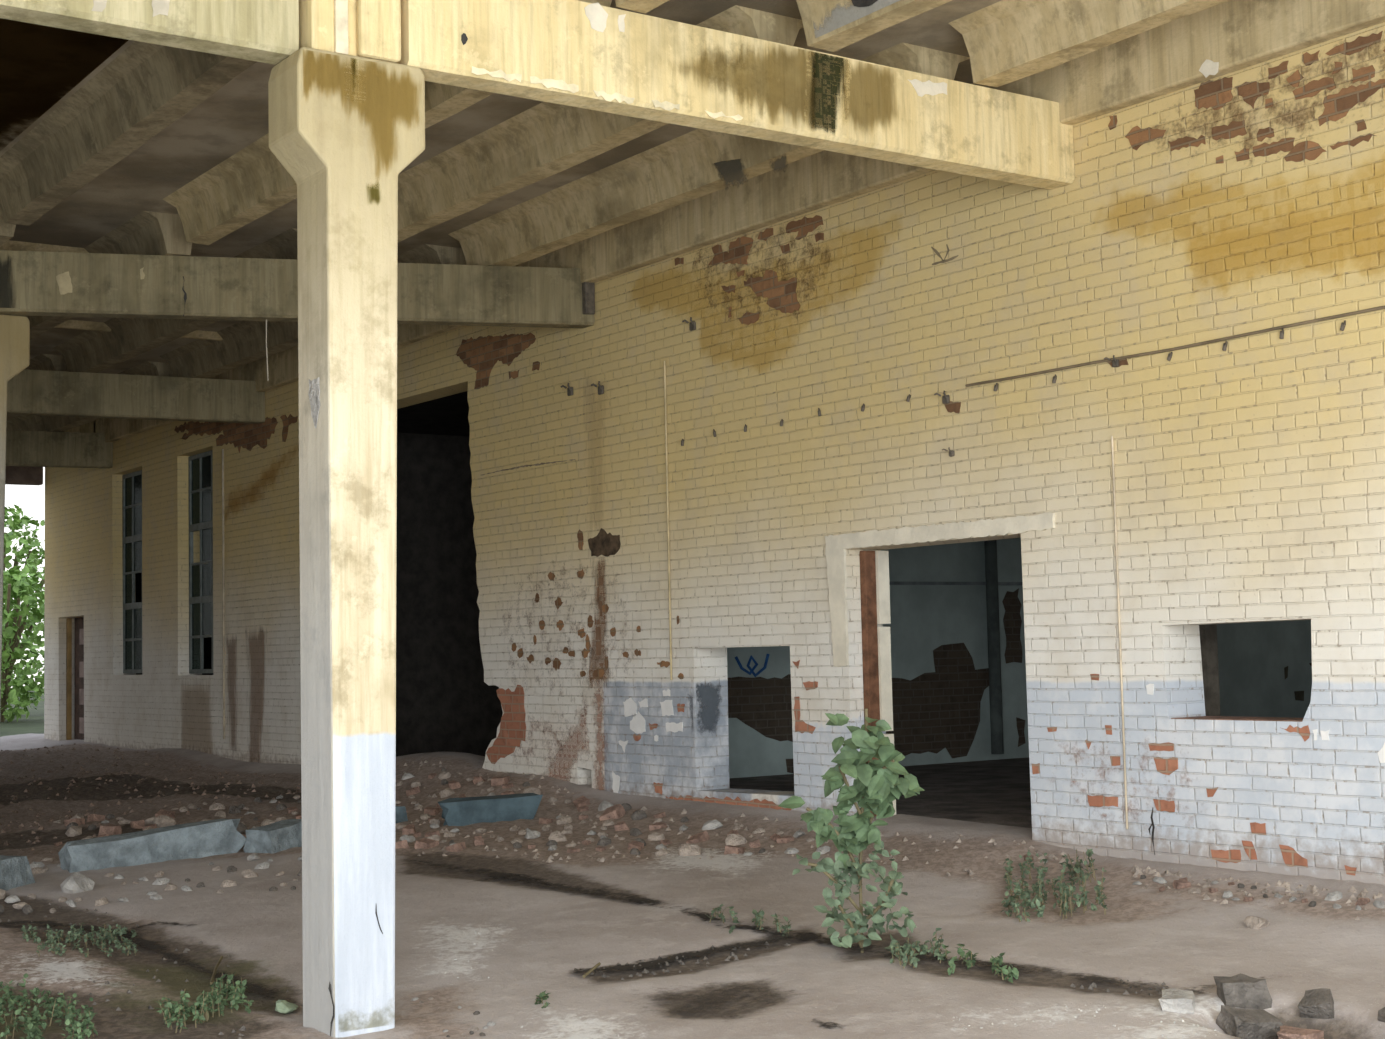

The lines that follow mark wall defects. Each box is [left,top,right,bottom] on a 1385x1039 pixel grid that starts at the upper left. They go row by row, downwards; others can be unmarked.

damp [0,18,128,147]
flaking render [1108,31,1385,164]
damp [370,186,379,202]
flaking render [675,215,830,325]
flaking render [456,333,540,389]
flaking render [174,377,320,453]
spalling [577,528,621,579]
spalling [512,572,641,679]
rust [589,561,609,687]
flaking render [486,685,562,764]
flaking render [1148,742,1178,775]
flaking render [1211,822,1266,863]